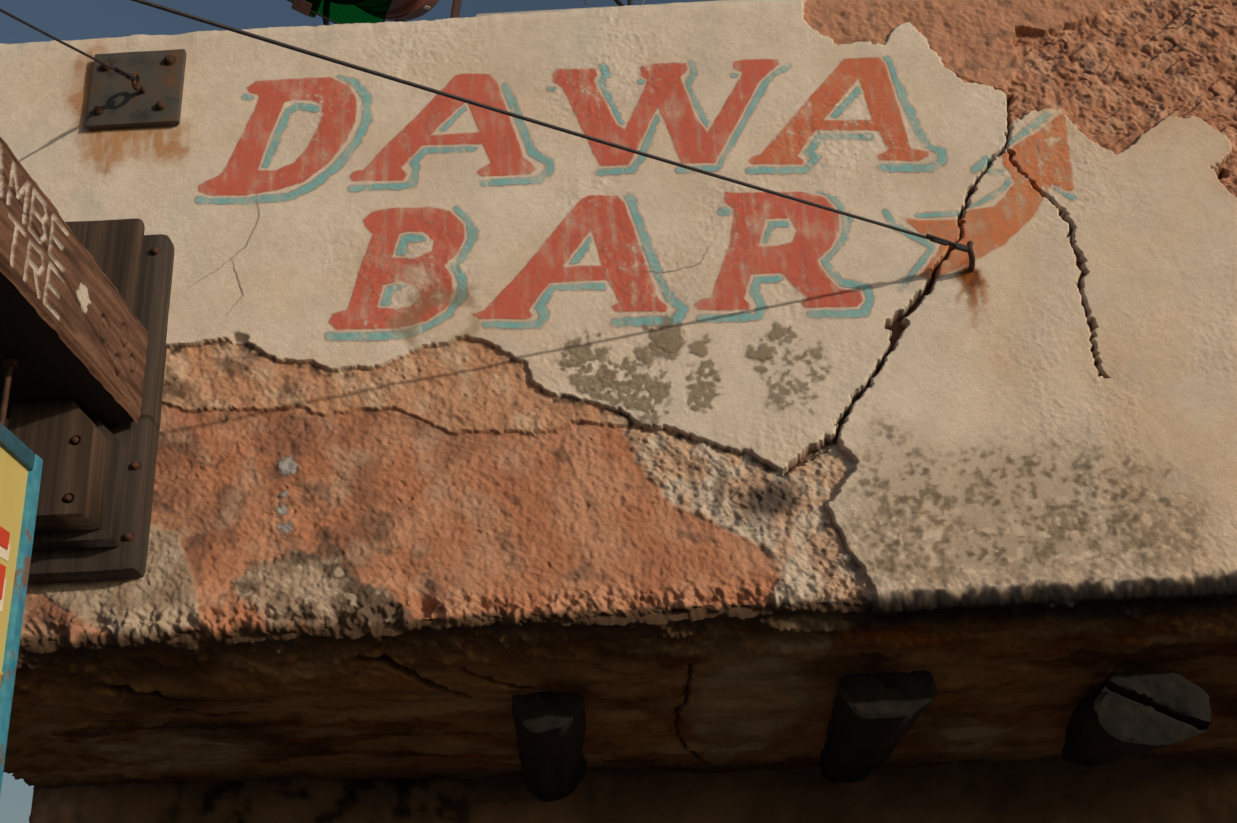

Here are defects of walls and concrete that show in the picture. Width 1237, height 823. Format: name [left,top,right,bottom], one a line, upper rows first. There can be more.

spalling [802,0,1237,197]
crack [783,115,1106,476]
corrosion [959,265,984,300]
spalling [19,315,877,649]
water stain [850,452,1237,622]
crack [358,653,522,698]
crack [674,663,718,768]